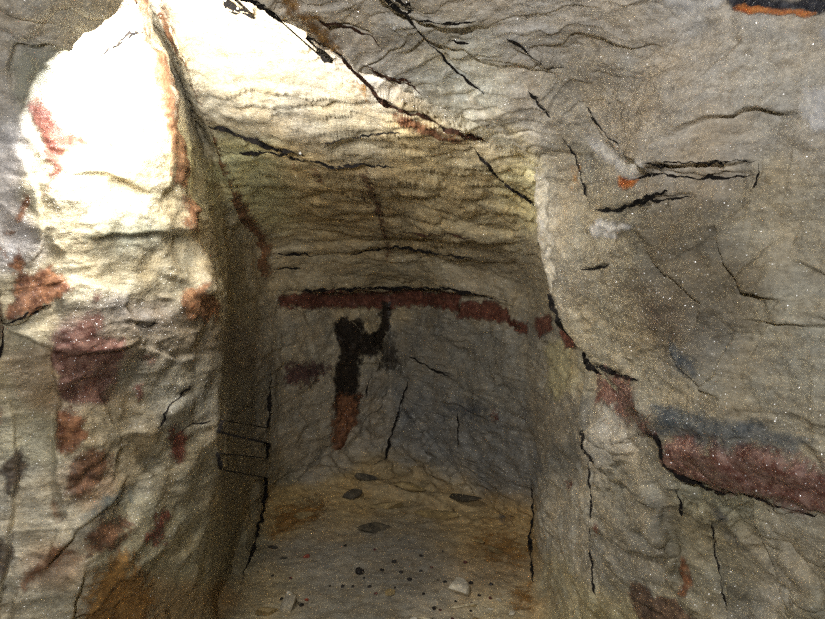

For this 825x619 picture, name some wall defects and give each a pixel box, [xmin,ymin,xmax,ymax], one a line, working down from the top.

crack [100,30,154,58]
crack [208,0,540,246]
crack [350,232,477,259]
crack [276,252,316,270]
crack [581,263,609,271]
crack [279,286,506,301]
crack [408,356,454,377]
crack [374,382,408,465]
crack [579,430,596,595]